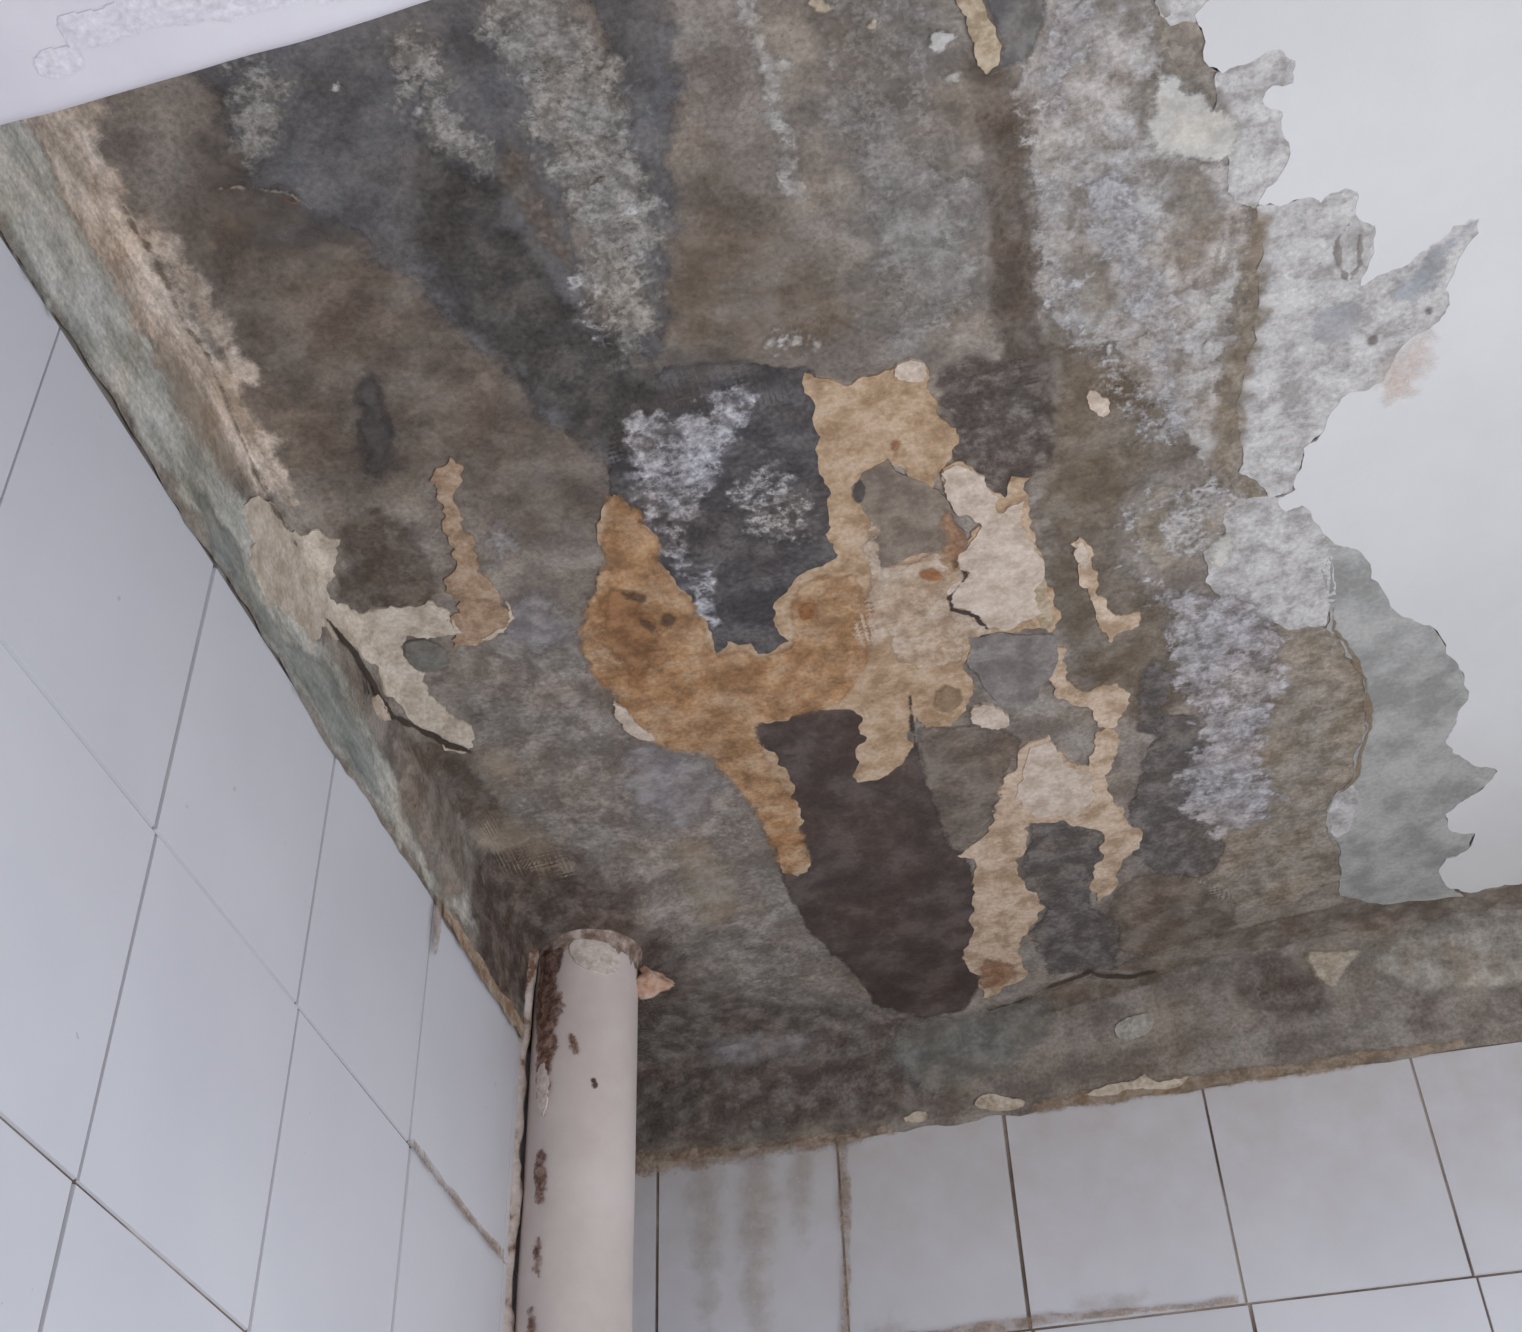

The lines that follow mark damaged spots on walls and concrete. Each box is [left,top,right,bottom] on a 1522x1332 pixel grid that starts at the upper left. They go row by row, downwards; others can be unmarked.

peeling [93,72,379,371]
damp [736,0,807,202]
damp [808,0,988,361]
crack [123,206,297,546]
peeling [0,214,497,966]
damp [339,509,432,608]
crack [327,619,471,754]
peeling [228,0,1522,1161]
damp [1123,475,1261,573]
rust [433,898,621,1116]
rust [532,1237,541,1277]
rust [534,1150,547,1204]